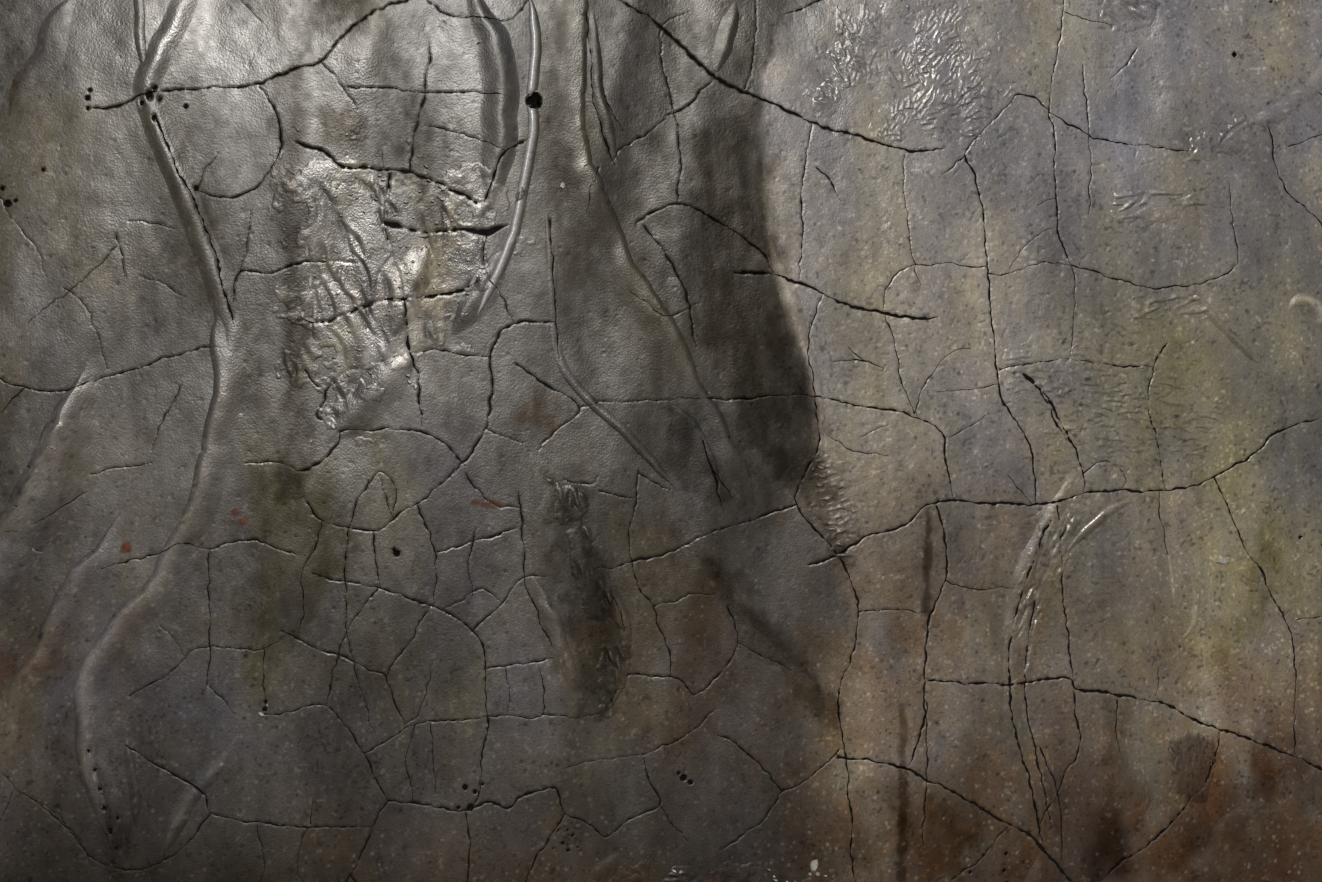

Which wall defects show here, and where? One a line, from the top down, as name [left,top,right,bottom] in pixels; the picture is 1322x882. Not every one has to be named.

crack [0,0,716,882]
crack [515,0,1322,882]